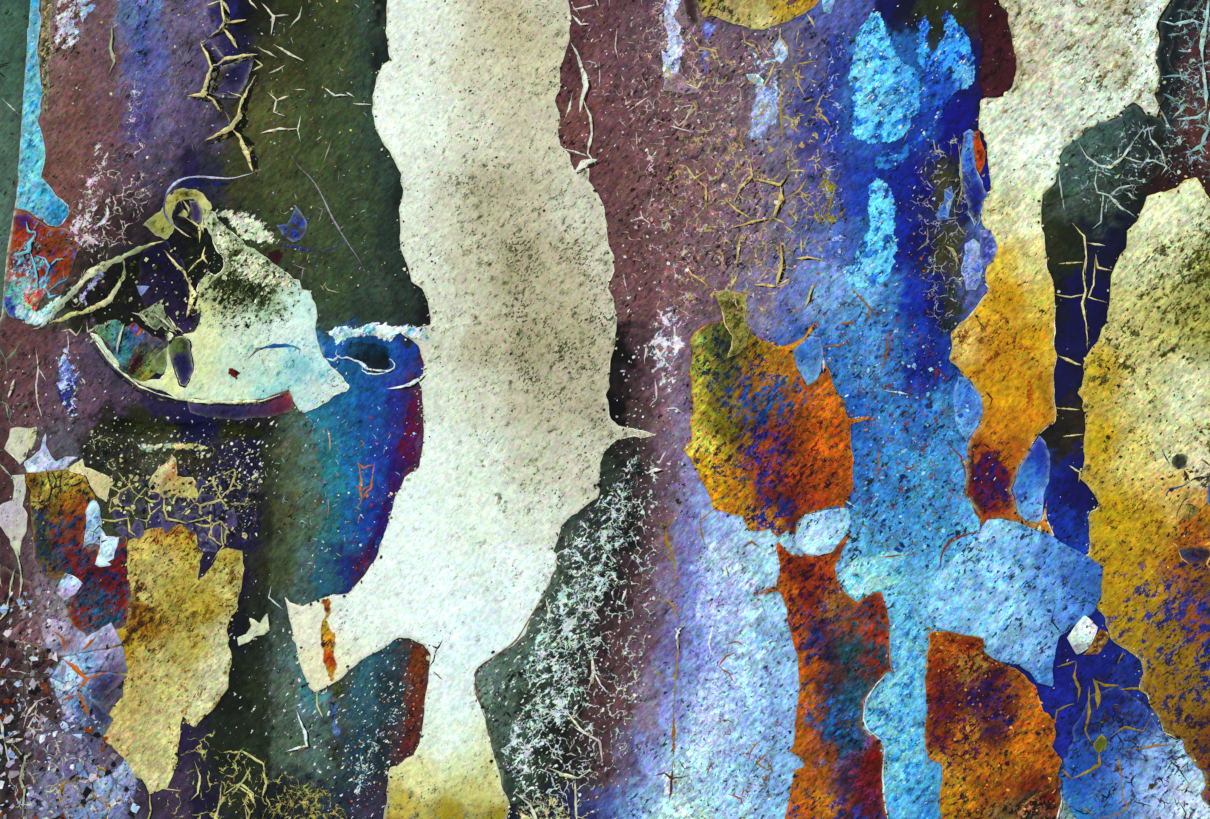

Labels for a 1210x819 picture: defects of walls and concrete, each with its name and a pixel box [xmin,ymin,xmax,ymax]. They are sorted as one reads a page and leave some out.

peeling [79,270,106,307]
peeling [137,239,199,386]
crack [0,0,372,572]
peeling [189,200,203,223]
peeling [277,206,307,242]
peeling [285,0,656,819]
peeling [714,290,750,358]
peeling [793,336,823,386]
peeling [839,0,1210,819]
peeling [794,508,851,556]
peeling [0,427,270,819]
crack [0,549,343,819]